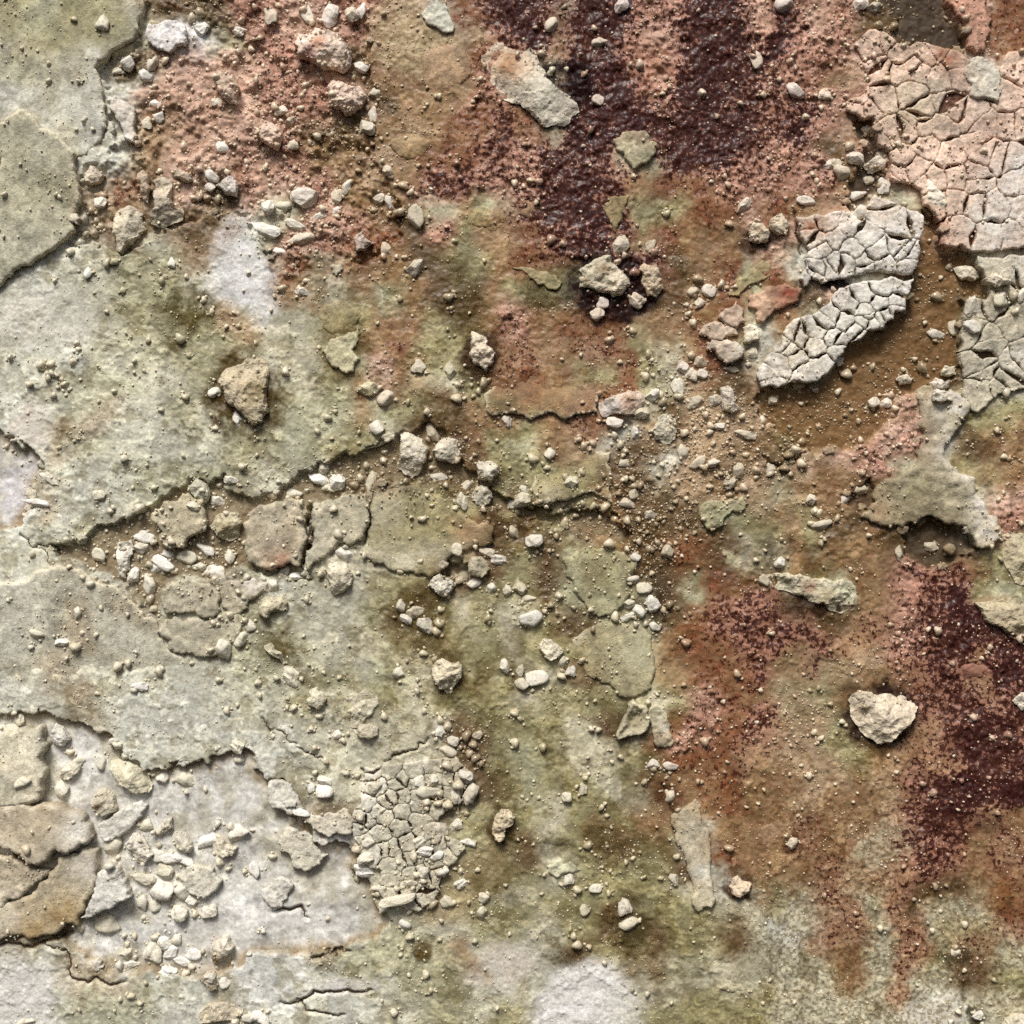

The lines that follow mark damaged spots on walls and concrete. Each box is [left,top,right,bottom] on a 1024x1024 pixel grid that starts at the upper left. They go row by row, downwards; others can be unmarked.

rust [406,0,864,286]
crack [756,29,1024,413]
rust [490,298,550,387]
rust [554,286,638,400]
rust [686,254,743,387]
crack [21,535,61,566]
crack [303,509,314,565]
peeling [0,423,674,748]
crack [365,492,374,542]
spalling [0,705,389,1023]
crack [352,739,474,913]
rust [651,537,1024,1006]